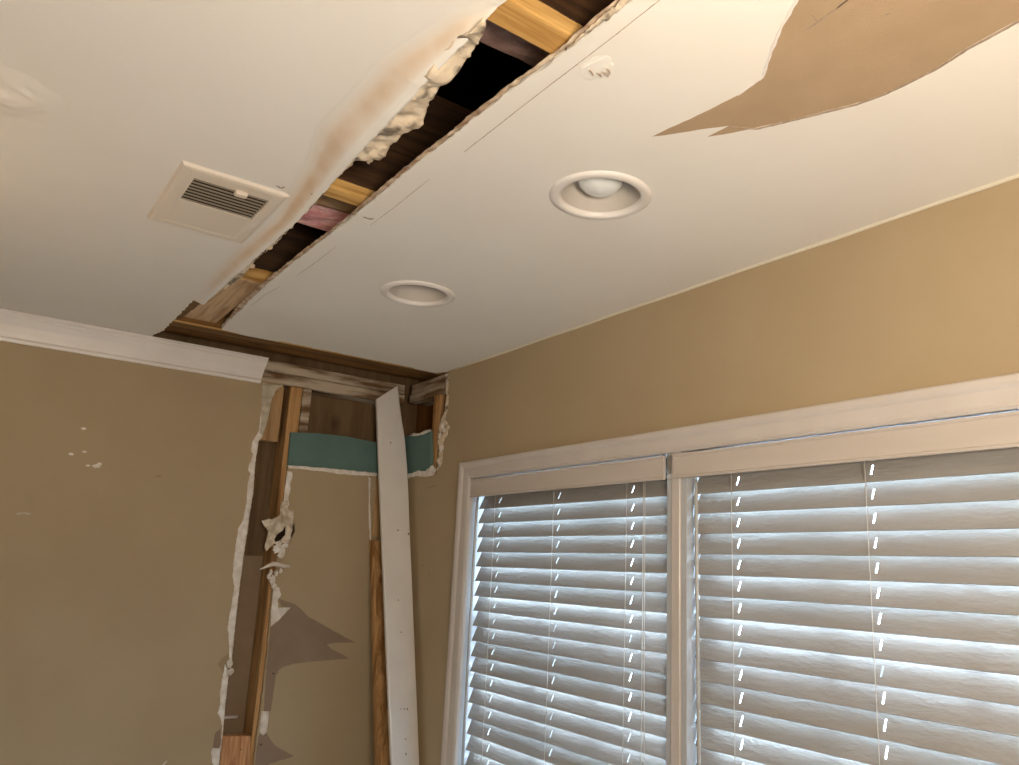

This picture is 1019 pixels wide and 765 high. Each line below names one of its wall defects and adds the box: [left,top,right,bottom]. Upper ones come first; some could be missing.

peeling [565,0,629,51]
peeling [654,0,1019,137]
damp [189,0,499,304]
peeling [264,599,356,711]
peeling [255,733,293,765]